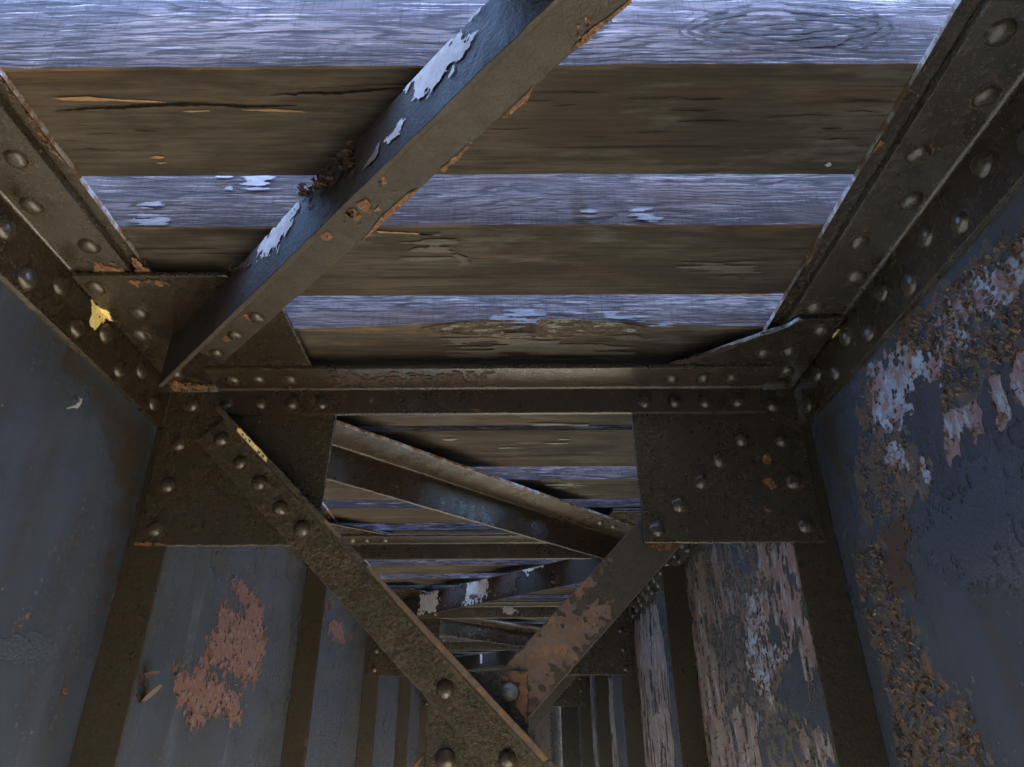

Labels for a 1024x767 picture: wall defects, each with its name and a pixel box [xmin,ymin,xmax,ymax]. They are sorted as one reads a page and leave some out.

crack [57,87,401,150]
peeling [228,119,406,270]
peeling [403,7,481,101]
peeling [850,217,1024,767]
peeling [132,575,269,735]
peeling [417,578,496,616]
corrosion [366,557,623,762]
peeling [634,602,675,767]
peeling [684,543,835,767]